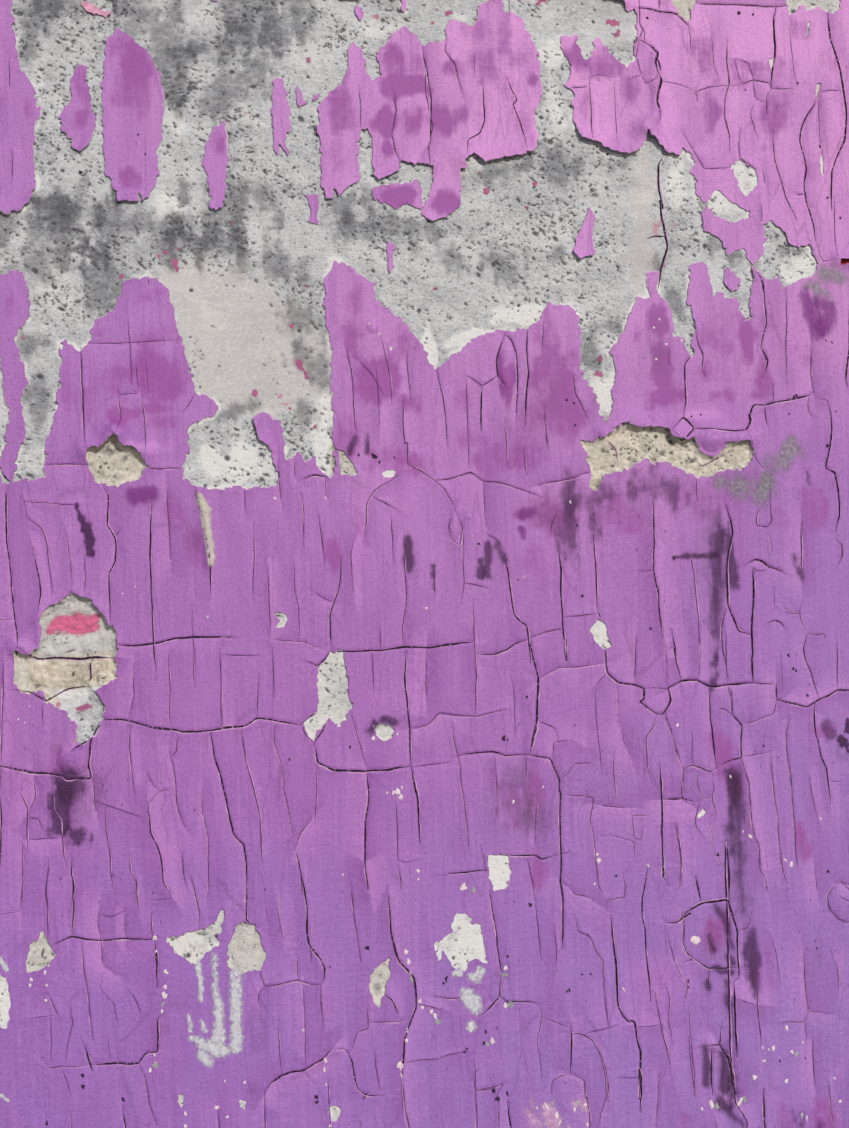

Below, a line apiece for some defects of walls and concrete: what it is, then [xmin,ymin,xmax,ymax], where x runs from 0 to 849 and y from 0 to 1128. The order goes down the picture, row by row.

peeling [786,0,840,36]
peeling [0,0,818,491]
spalling [14,591,119,745]
peeling [304,650,353,741]
peeling [488,854,512,891]
peeling [166,909,267,975]
peeling [434,913,488,971]
peeling [0,974,11,1029]